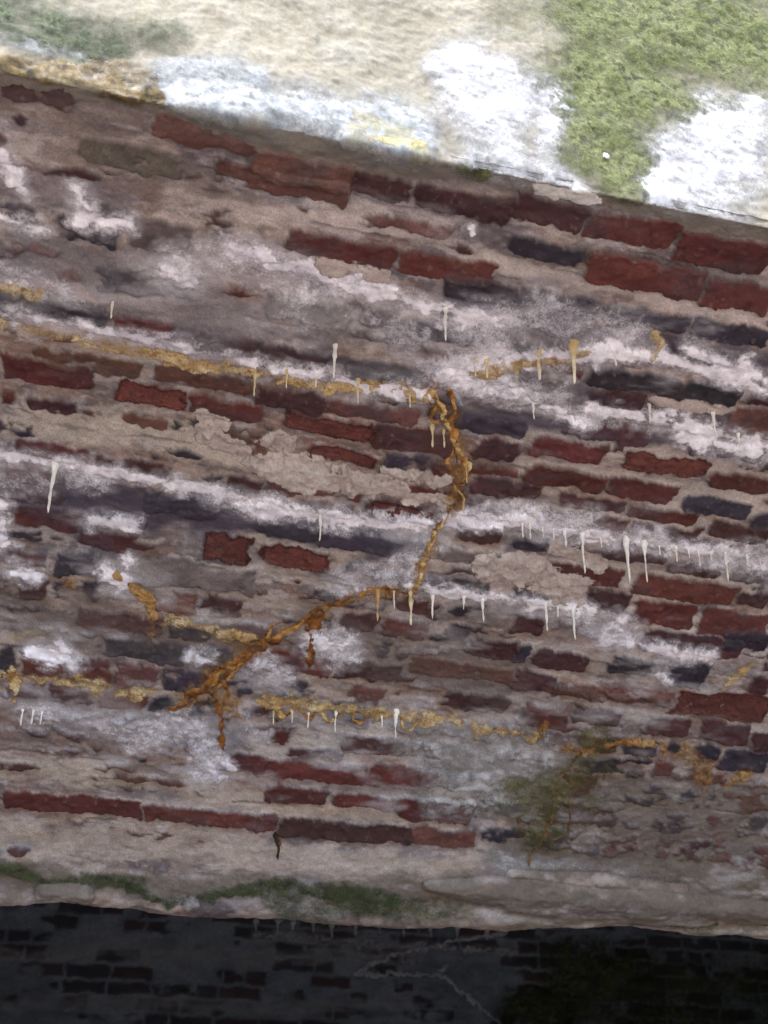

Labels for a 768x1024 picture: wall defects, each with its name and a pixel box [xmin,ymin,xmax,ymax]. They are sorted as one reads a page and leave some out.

damp [0,147,31,201]
damp [0,213,51,238]
damp [66,179,139,236]
damp [0,231,768,463]
damp [0,448,768,577]
damp [9,560,45,585]
damp [92,552,136,595]
crack [166,387,472,751]
damp [298,627,361,667]
damp [329,545,718,667]
damp [2,700,238,785]
damp [404,724,577,818]